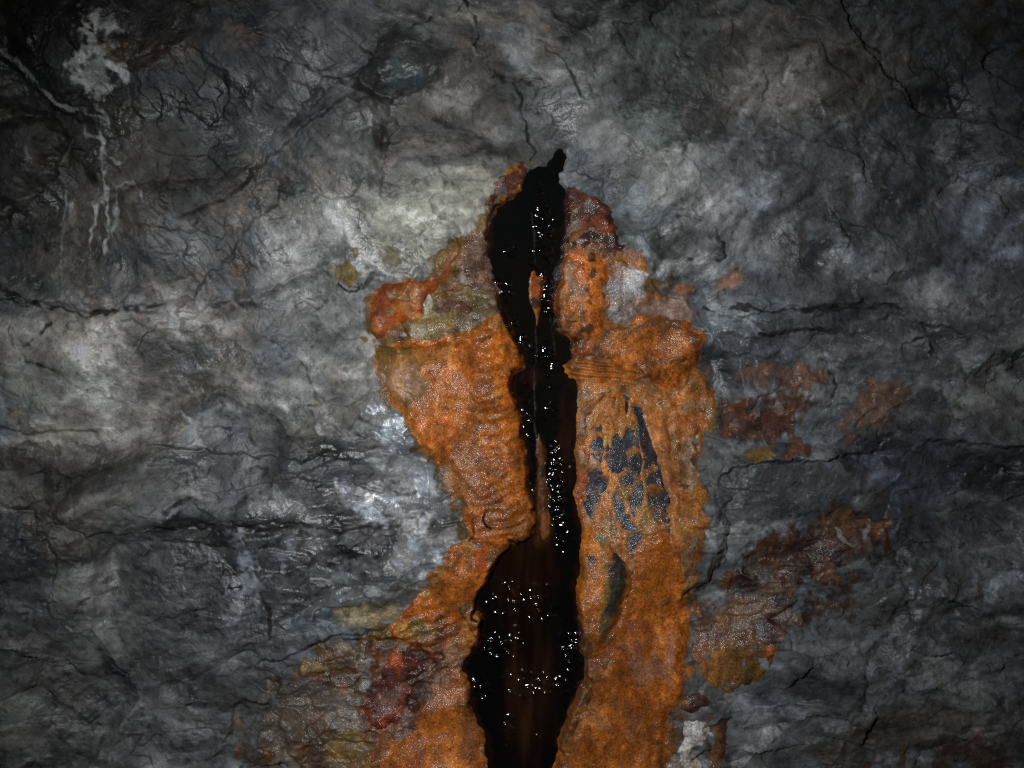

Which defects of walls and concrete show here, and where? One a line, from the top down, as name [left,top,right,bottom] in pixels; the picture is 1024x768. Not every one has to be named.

leakage [63,9,129,99]
corrosion [234,161,537,768]
corrosion [552,187,893,768]